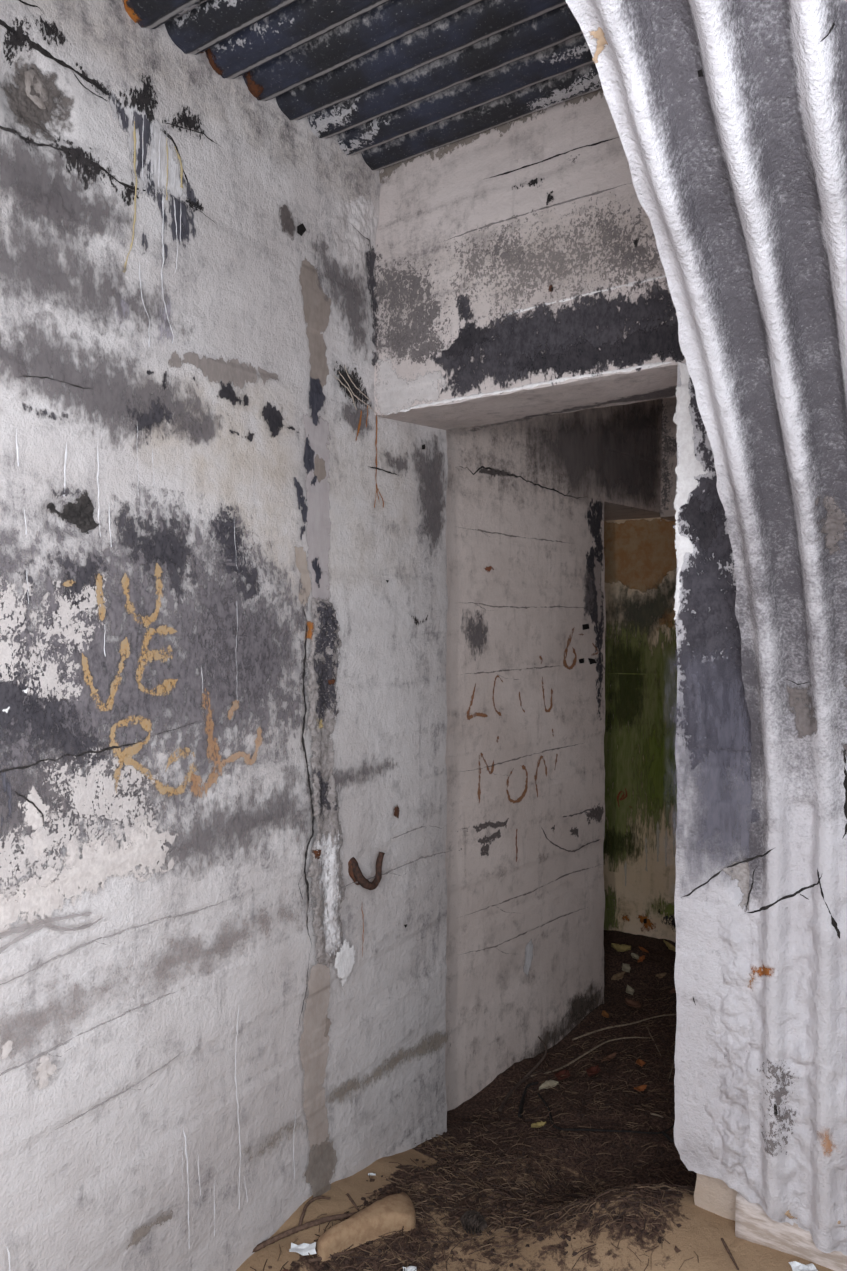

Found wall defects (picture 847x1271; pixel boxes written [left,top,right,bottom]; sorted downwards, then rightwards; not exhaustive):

water stain [3,14,71,69]
spalling [0,58,74,140]
crack [0,0,220,223]
water stain [76,62,205,347]
water stain [17,341,92,389]
water stain [299,259,378,437]
spalling [47,487,99,536]
peeling [0,574,107,708]
peeling [0,747,178,933]
crack [0,721,198,825]
crack [298,595,315,1028]
crack [681,847,840,939]